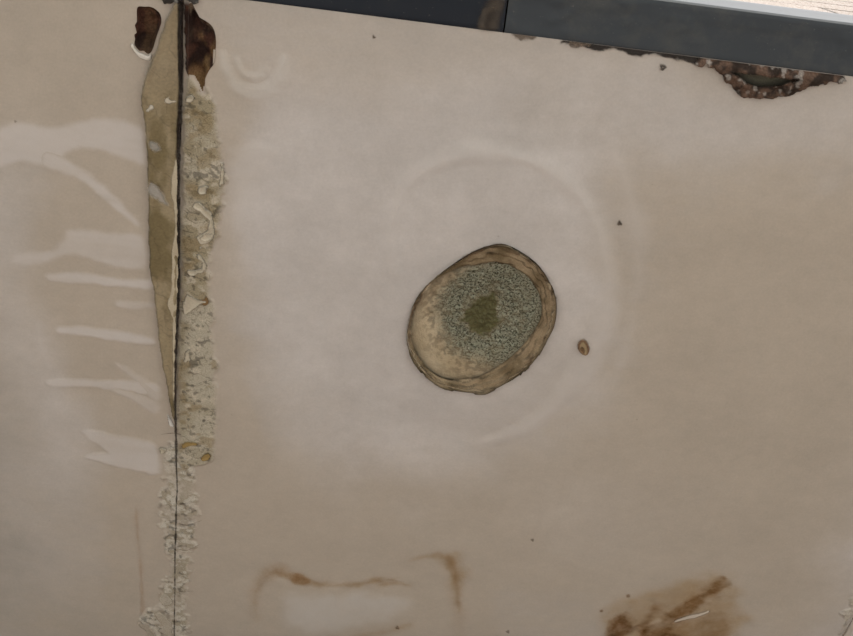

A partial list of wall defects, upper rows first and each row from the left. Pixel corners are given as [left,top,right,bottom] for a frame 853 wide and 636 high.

spalling [561,40,846,99]
leakage [0,114,156,312]
leakage [30,316,165,416]
peeling [131,3,230,472]
crack [168,0,196,636]